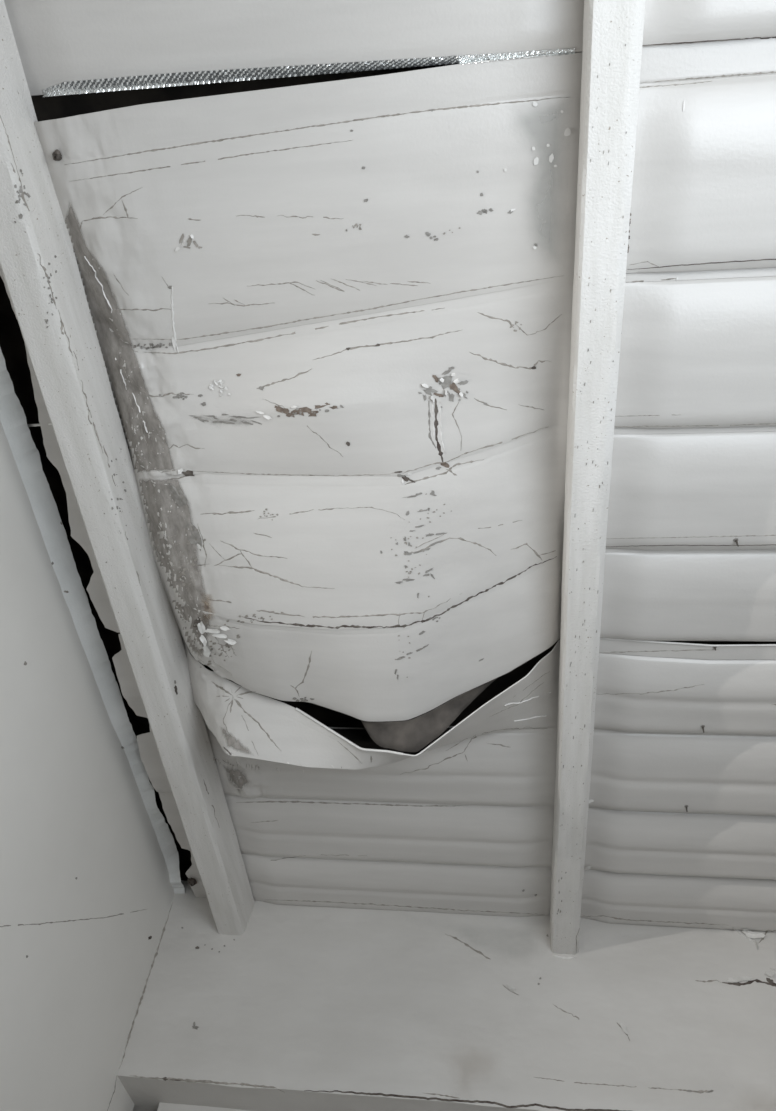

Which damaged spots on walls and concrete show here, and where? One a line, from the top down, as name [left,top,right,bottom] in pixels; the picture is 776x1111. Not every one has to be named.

crack [0,116,31,223]
crack [114,275,171,311]
crack [135,276,562,390]
crack [37,253,128,540]
peeling [418,367,468,408]
crack [151,398,547,485]
crack [200,507,405,589]
crack [196,520,557,702]
peeling [215,729,259,789]
crack [283,900,541,915]
crack [0,903,720,1111]